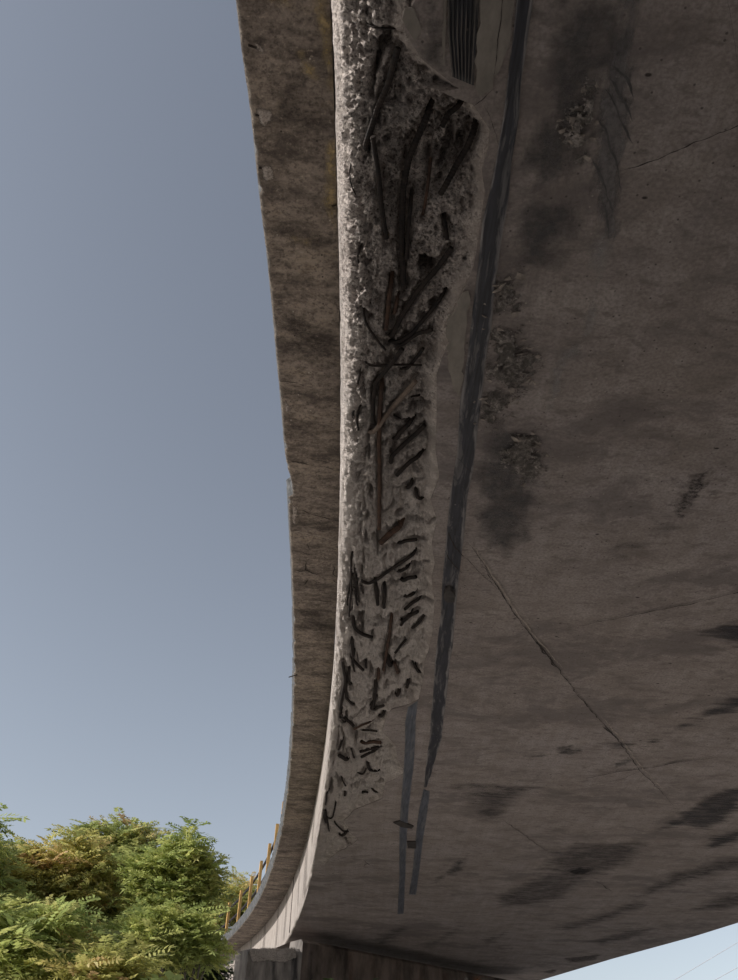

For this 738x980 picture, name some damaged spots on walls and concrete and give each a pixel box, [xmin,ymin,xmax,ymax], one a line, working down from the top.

peeling [554,77,601,164]
spalling [312,0,489,865]
crack [445,530,726,806]